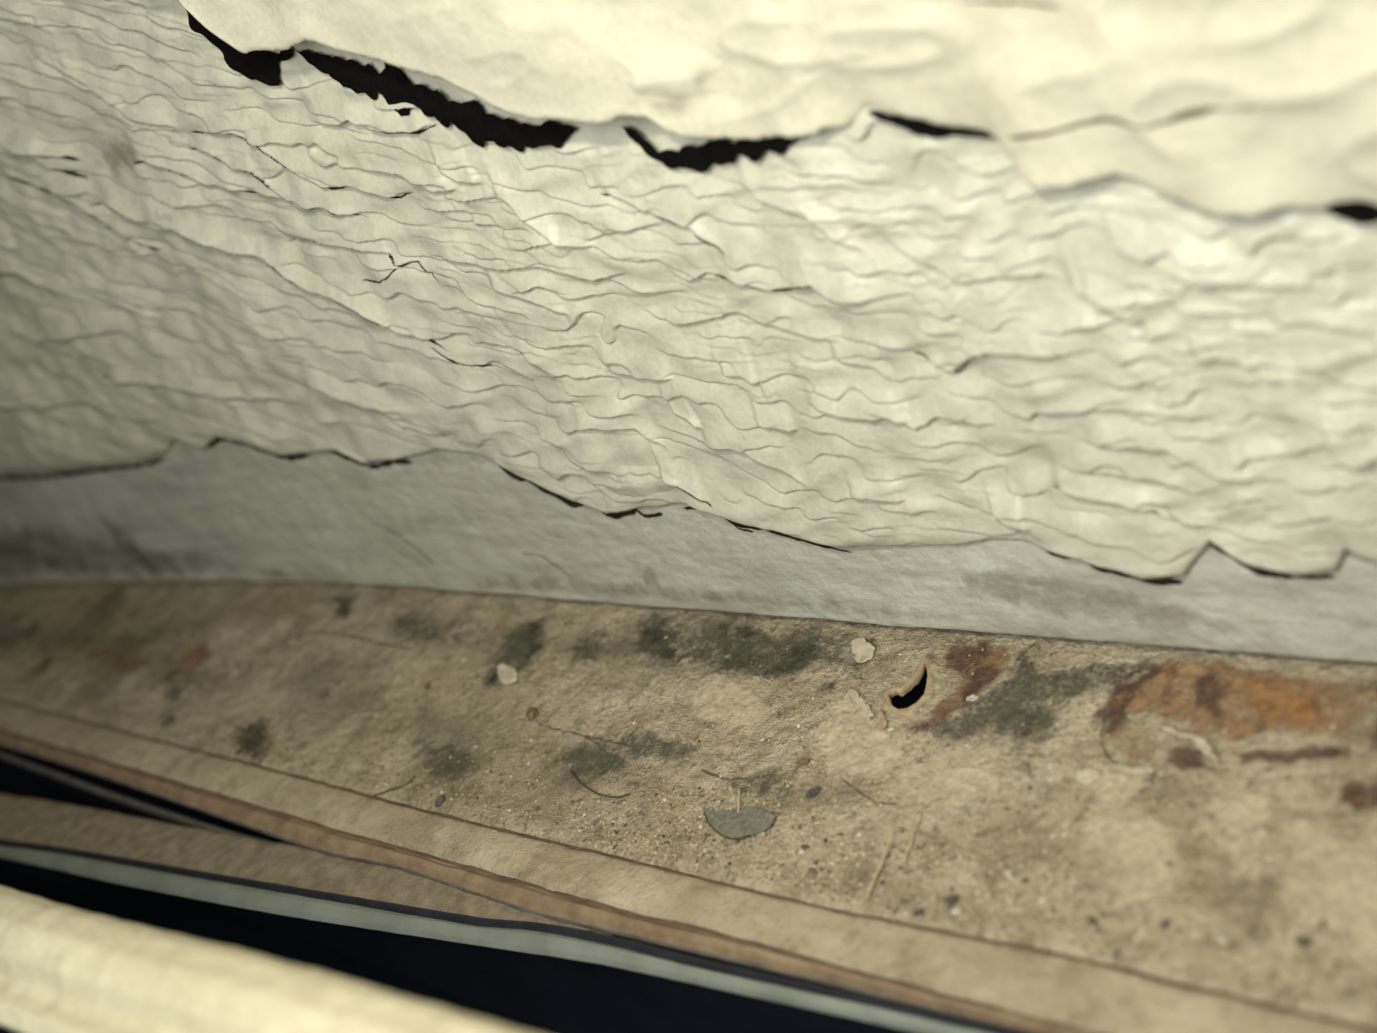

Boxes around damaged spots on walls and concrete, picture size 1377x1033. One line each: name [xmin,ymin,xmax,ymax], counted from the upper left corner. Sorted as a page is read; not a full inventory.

crack [186,10,578,153]
crack [622,126,809,173]
crack [867,106,1258,140]
crack [1319,200,1377,225]
peeling [0,0,1377,579]
crack [497,464,852,553]
leakage [478,620,543,685]
leakage [636,615,858,678]
corrosion [912,643,1005,731]
leakage [941,645,1150,742]
corrosion [1093,661,1377,762]
corrosion [1167,747,1202,769]